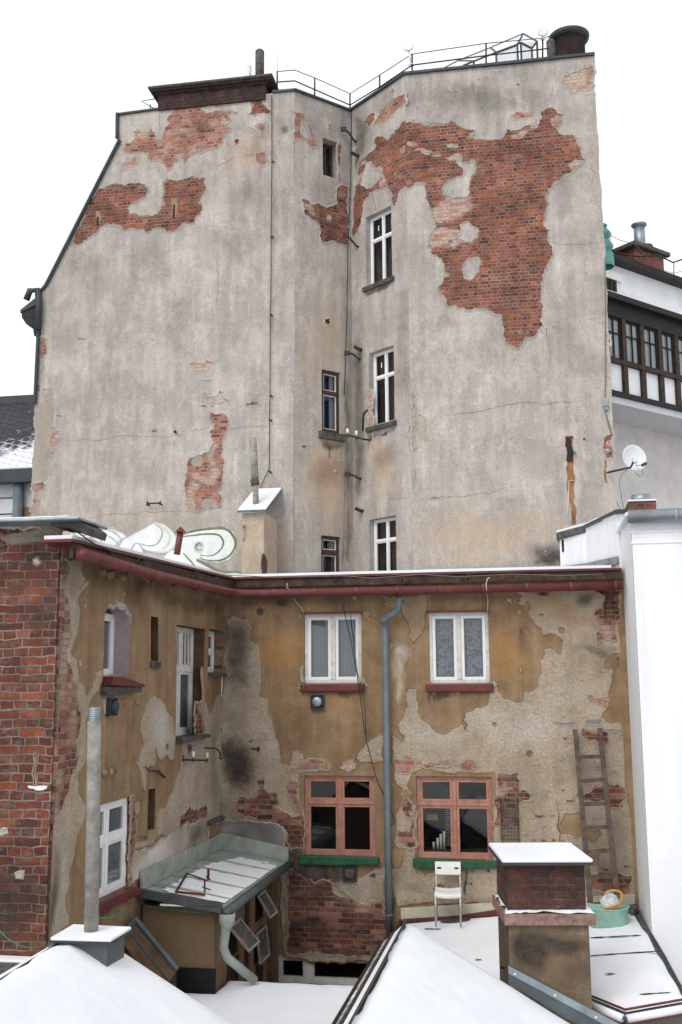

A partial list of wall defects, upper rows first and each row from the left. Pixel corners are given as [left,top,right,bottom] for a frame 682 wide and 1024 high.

spalling [561,65,597,98]
spalling [68,100,271,248]
spalling [301,82,586,351]
spalling [182,358,230,512]
corrosion [565,436,576,525]
flaking render [120,590,634,965]